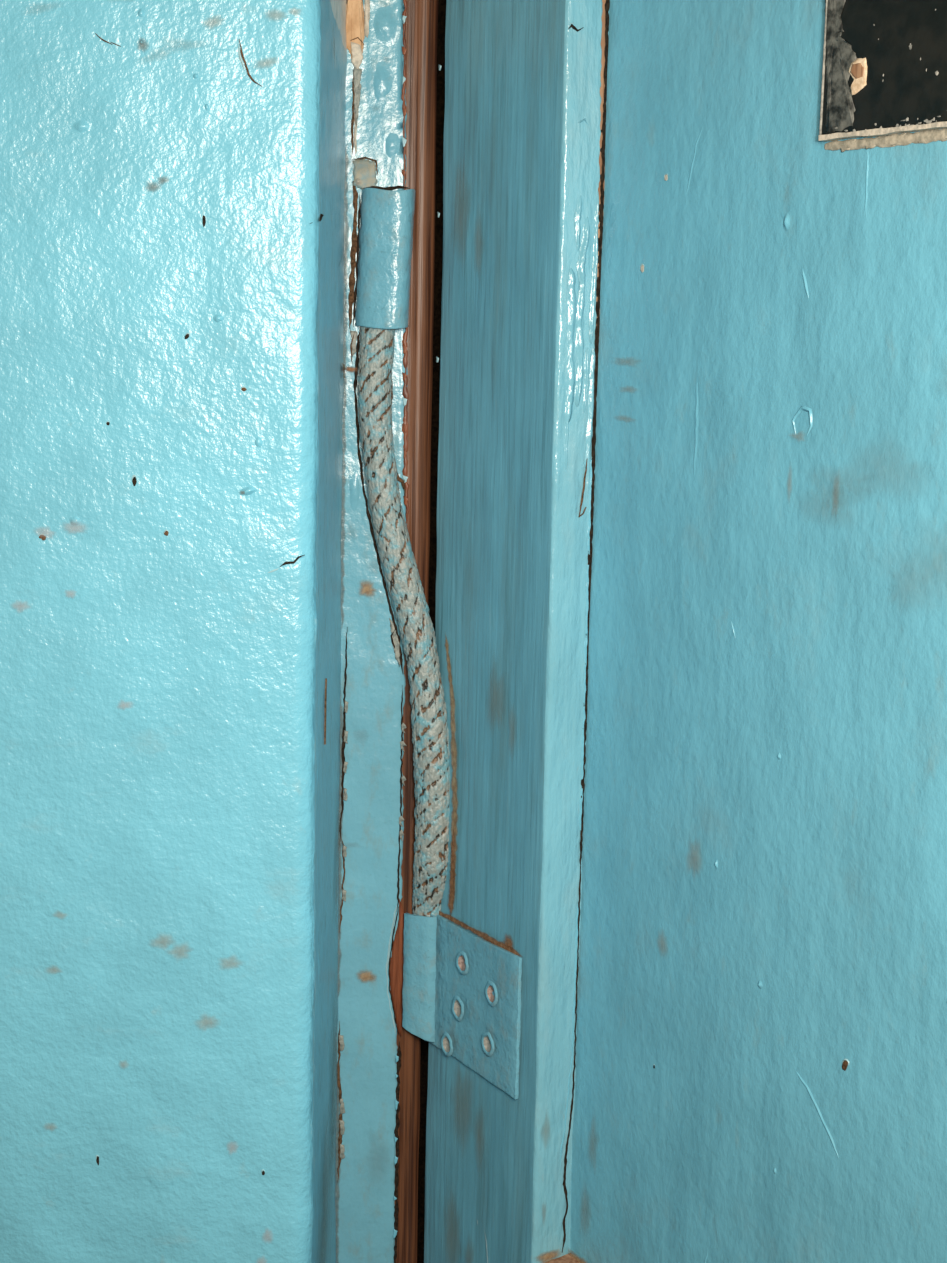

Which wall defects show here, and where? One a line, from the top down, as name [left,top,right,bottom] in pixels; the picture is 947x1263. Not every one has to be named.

spalling [346,0,370,125]
crack [560,0,610,1253]
crack [324,627,349,931]
crack [337,1021,345,1179]